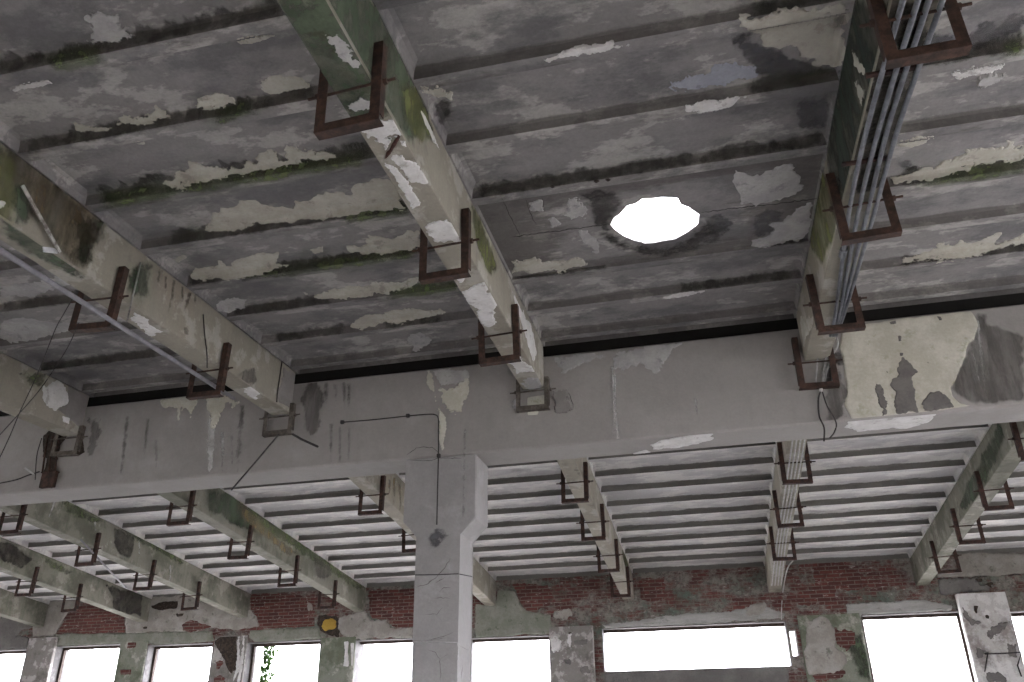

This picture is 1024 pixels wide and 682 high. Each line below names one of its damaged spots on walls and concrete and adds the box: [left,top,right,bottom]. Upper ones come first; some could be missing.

leakage [733,34,824,92]
peeling [162,145,337,192]
peeling [205,120,428,232]
leakage [480,98,828,257]
peeling [732,164,804,207]
peeling [190,252,288,282]
leakage [955,315,1023,403]
leakage [301,382,327,434]
peeling [427,368,469,450]
flaking render [250,593,340,637]
flaking render [368,588,414,628]
flaking render [962,606,1017,658]